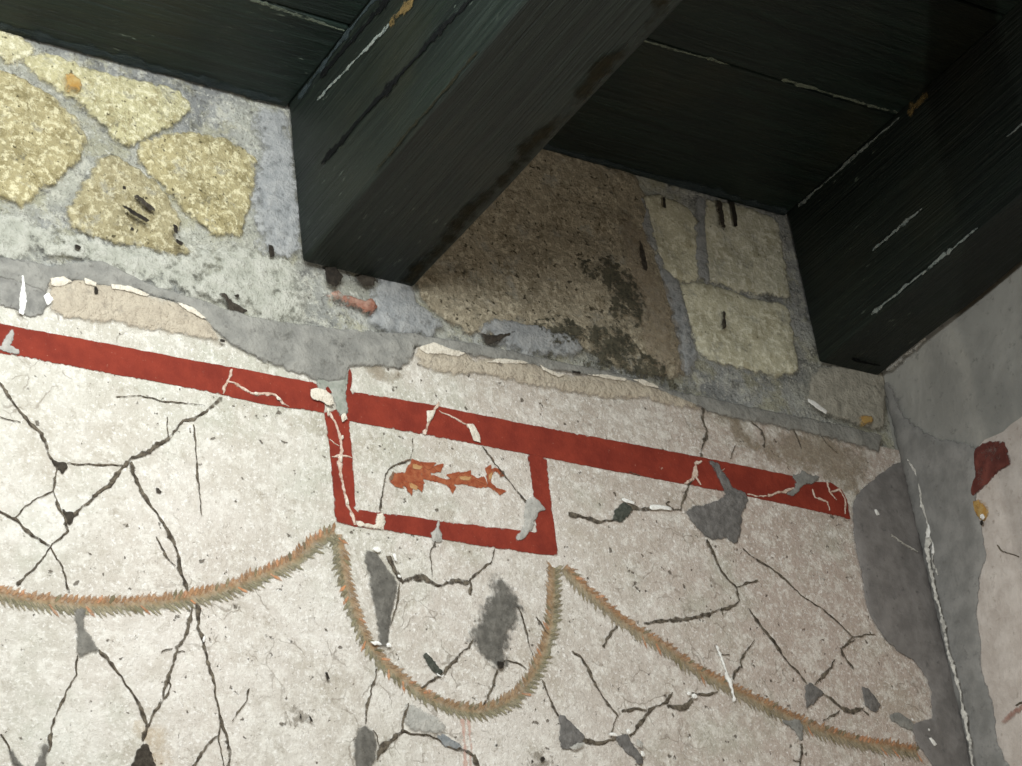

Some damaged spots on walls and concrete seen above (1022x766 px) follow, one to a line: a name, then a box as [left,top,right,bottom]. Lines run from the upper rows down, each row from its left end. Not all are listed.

peeling [19,275,27,315]
spalling [44,276,225,342]
water stain [534,241,679,390]
crack [0,369,285,766]
crack [329,411,356,525]
crack [386,541,495,624]
crack [379,402,527,511]
crack [572,539,875,745]
crack [891,459,974,766]
corrosion [973,500,988,526]
flaking render [131,744,156,766]
crack [365,639,480,766]